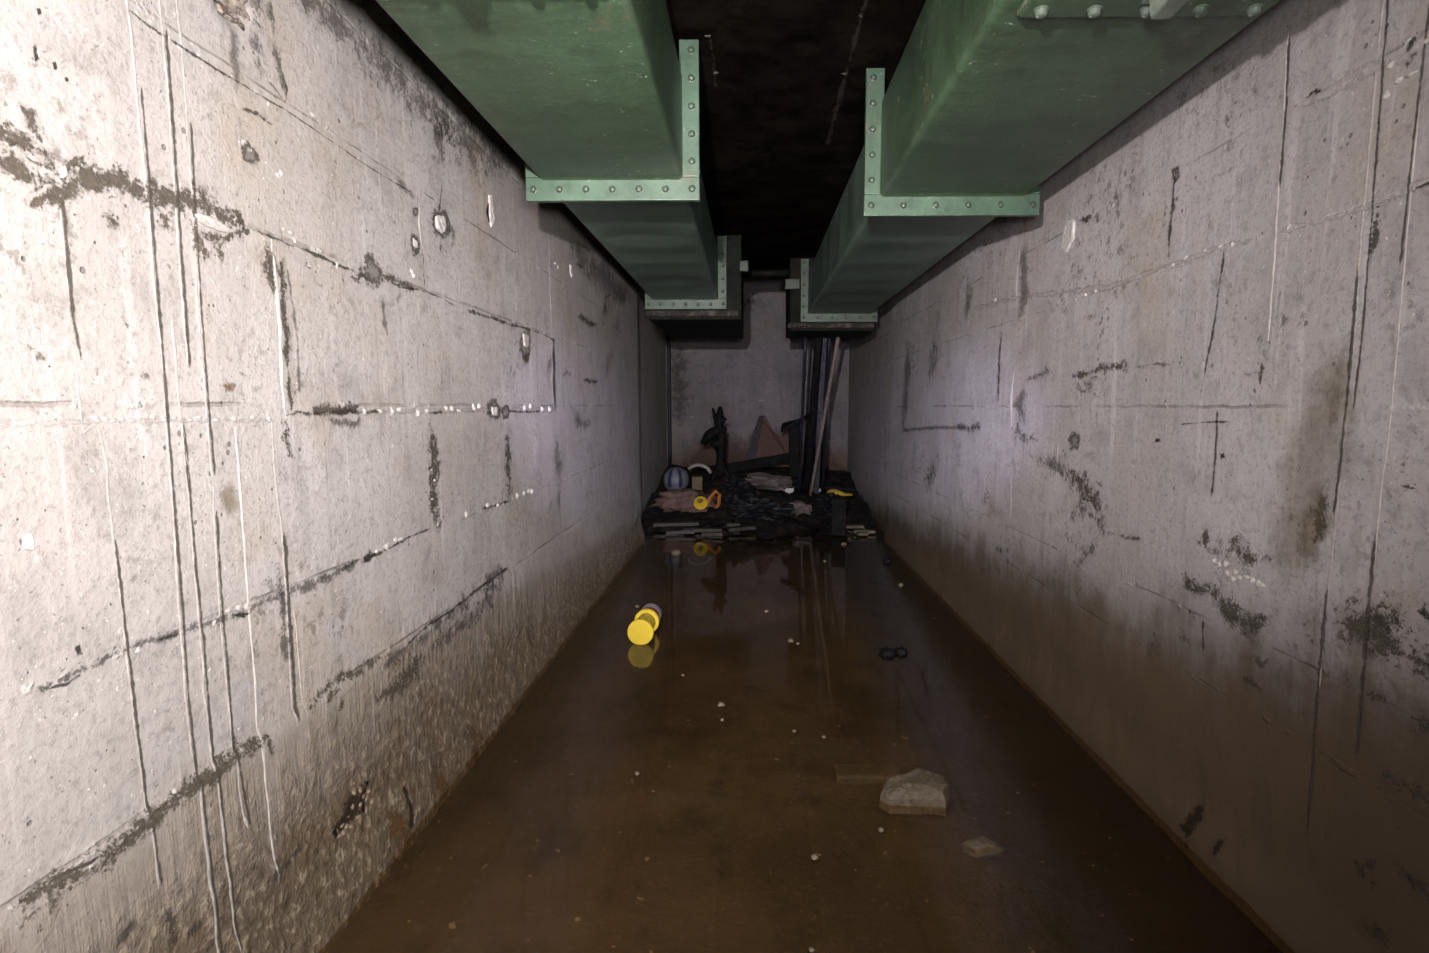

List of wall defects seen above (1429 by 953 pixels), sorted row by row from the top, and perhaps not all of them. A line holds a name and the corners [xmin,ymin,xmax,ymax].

spalling [214,0,288,103]
leakage [302,0,510,189]
crack [1281,178,1429,233]
leakage [0,0,301,953]
leakage [260,238,508,727]
leakage [504,435,514,497]
leakage [1305,0,1429,833]